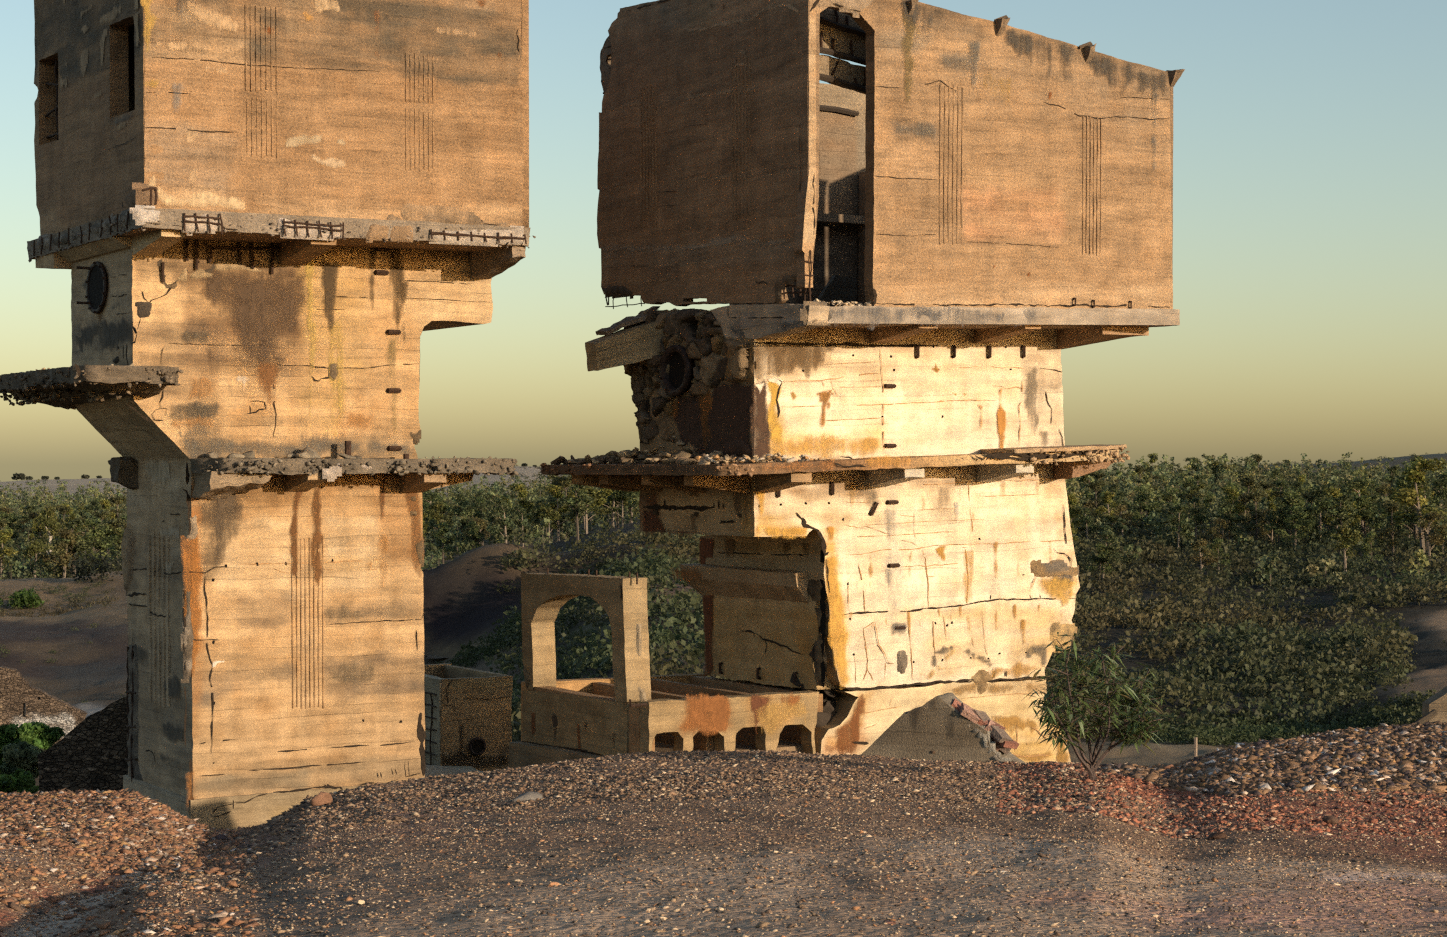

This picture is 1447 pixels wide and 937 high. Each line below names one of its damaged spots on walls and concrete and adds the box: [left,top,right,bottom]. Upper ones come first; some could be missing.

damp [1007,30,1072,70]
spalling [28,170,536,289]
spalling [135,302,152,318]
damp [206,259,338,361]
crack [873,289,1169,308]
spalling [0,356,183,406]
damp [172,402,219,419]
spalling [602,285,783,444]
crack [643,280,1103,757]
rust [827,557,848,685]
rust [684,694,730,734]
rust [837,695,865,755]